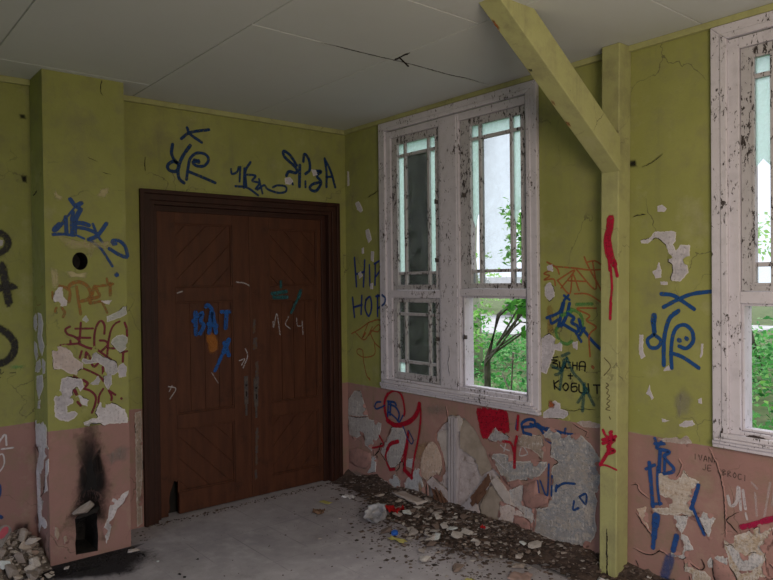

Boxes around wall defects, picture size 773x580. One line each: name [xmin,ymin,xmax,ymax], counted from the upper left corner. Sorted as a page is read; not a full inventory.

crack [323,43,483,84]
peeling [53,287,67,307]
peeling [107,303,127,322]
peeling [641,231,692,285]
peeling [33,313,143,544]
flaking render [348,391,442,493]
flaking render [488,401,600,549]
crack [631,482,737,580]
flaking render [636,470,773,580]
crack [709,447,739,538]